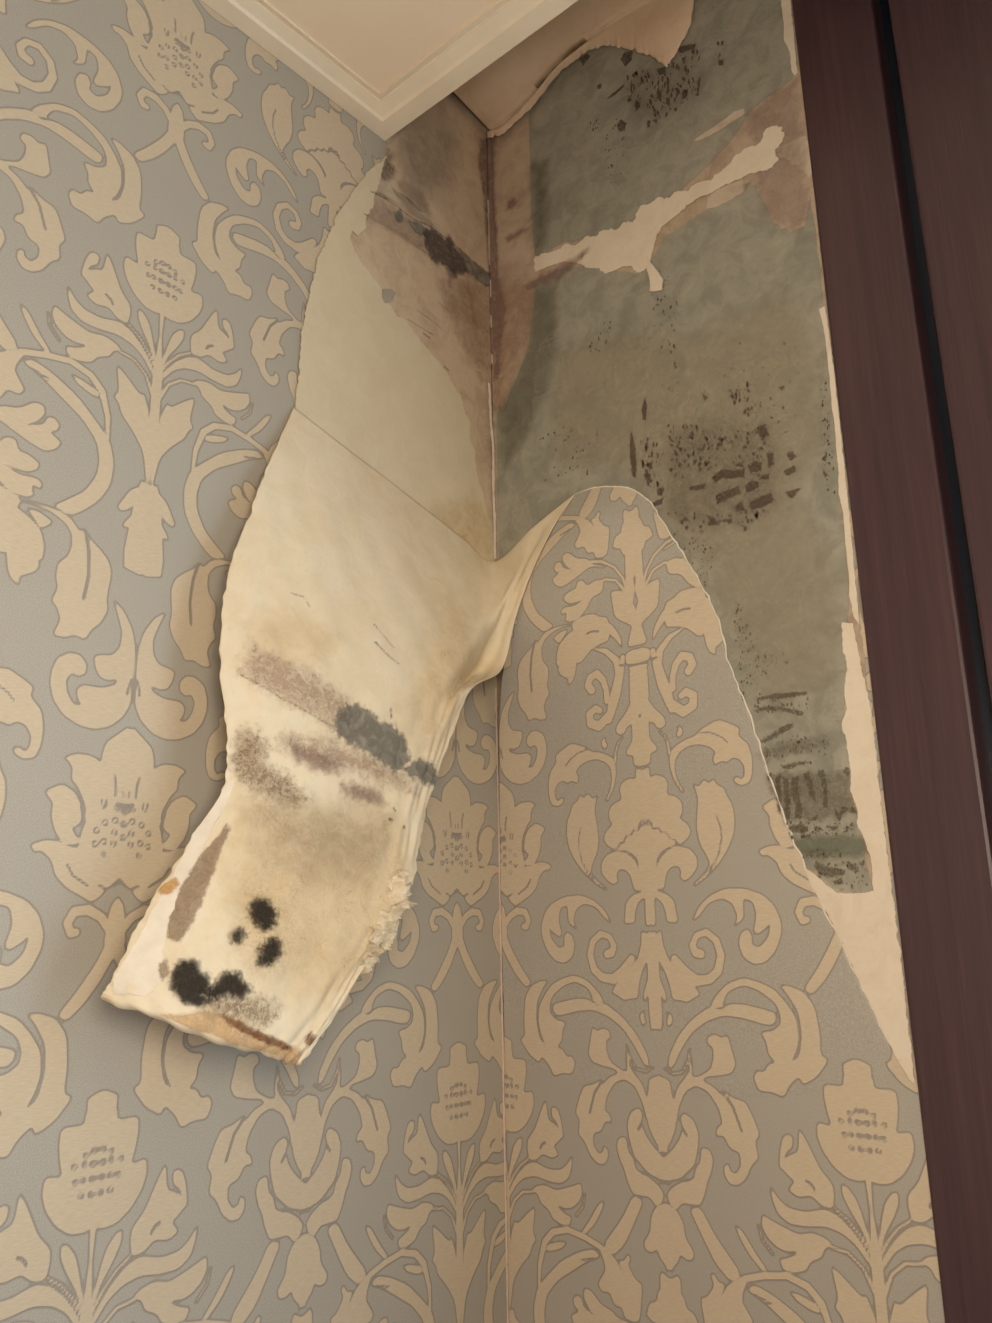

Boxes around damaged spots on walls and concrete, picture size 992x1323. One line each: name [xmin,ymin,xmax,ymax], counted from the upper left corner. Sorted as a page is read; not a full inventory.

damp [598,44,700,127]
damp [376,137,520,375]
flaking render [350,0,873,894]
damp [630,342,800,586]
damp [804,381,835,498]
damp [232,733,306,804]
damp [252,645,437,792]
damp [734,602,868,889]
damp [171,960,249,1006]
damp [233,898,282,965]